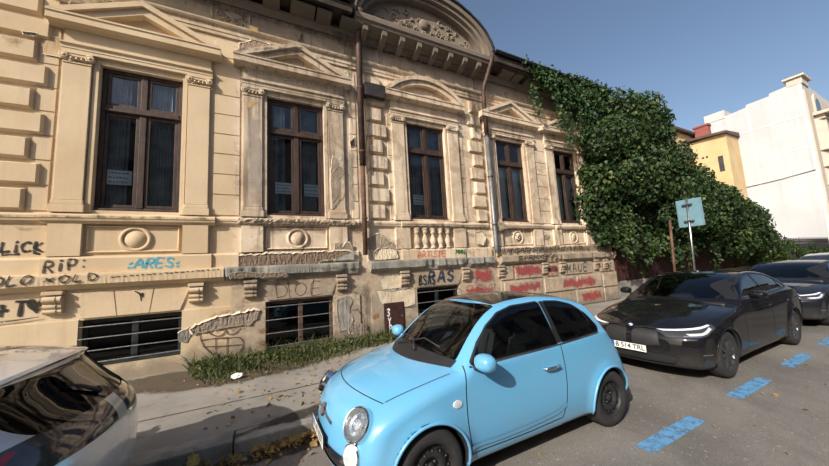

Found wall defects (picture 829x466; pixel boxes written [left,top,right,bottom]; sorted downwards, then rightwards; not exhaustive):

flaking render [330,155,345,209]
flaking render [367,233,401,250]
flaking render [229,241,355,279]
flaking render [375,274,416,307]
flaking render [178,307,260,343]